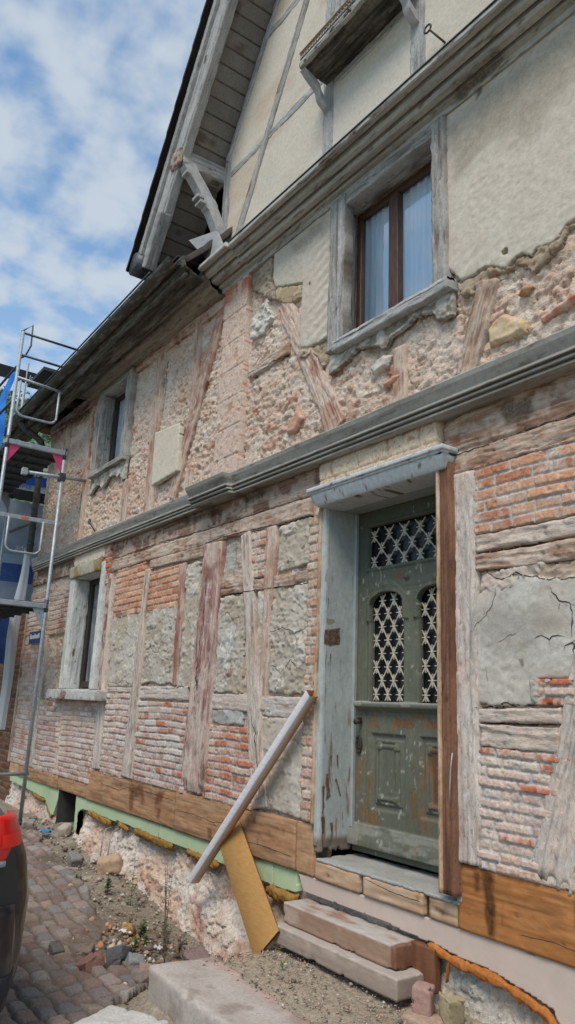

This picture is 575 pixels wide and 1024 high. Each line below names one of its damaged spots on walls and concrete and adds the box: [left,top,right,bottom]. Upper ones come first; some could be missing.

flaking render [250,257,310,340]
flaking render [456,223,575,299]
crack [473,539,575,653]
peeling [324,619,340,658]
peeling [321,755,341,833]
water stain [475,870,494,935]